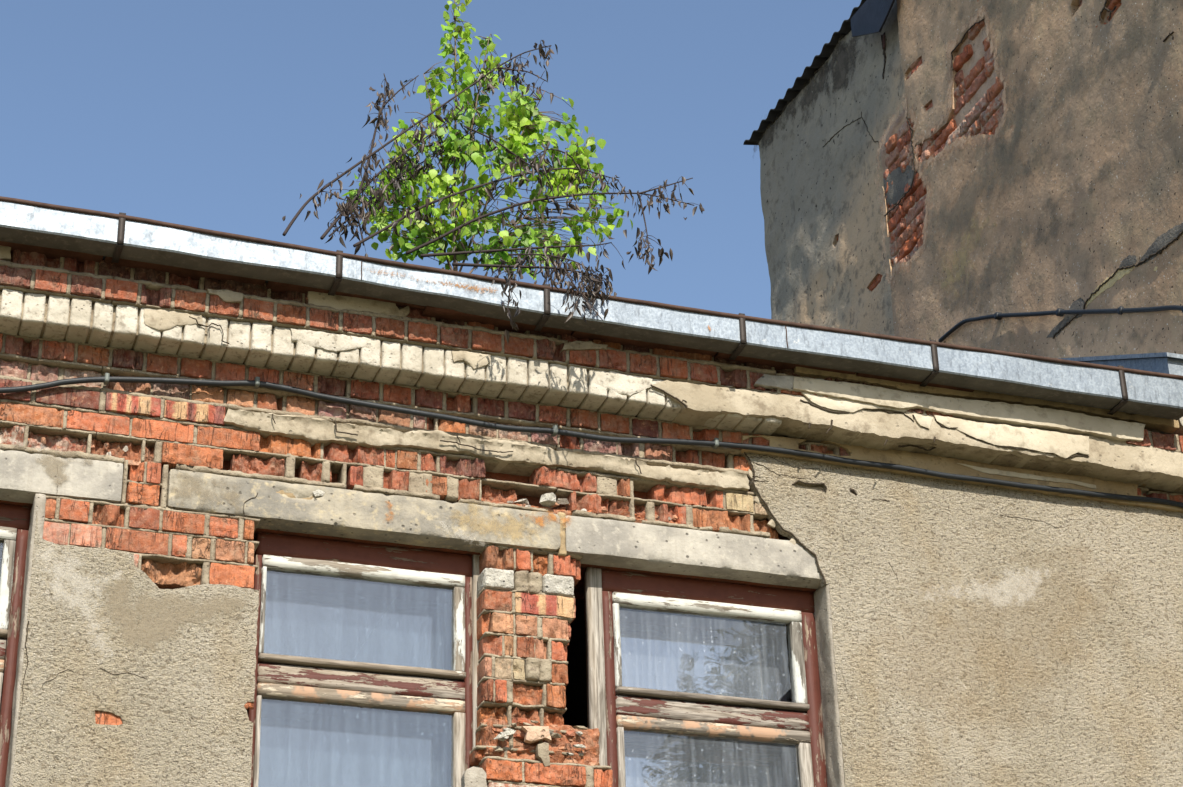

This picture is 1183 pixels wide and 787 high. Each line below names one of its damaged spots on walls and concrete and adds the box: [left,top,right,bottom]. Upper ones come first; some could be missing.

spalling [1096,0,1122,28]
spalling [869,0,1012,291]
spalling [1046,223,1183,338]
crack [189,316,229,344]
crack [800,399,1089,459]
crack [751,455,818,482]
spalling [482,493,678,524]
spalling [479,717,600,767]